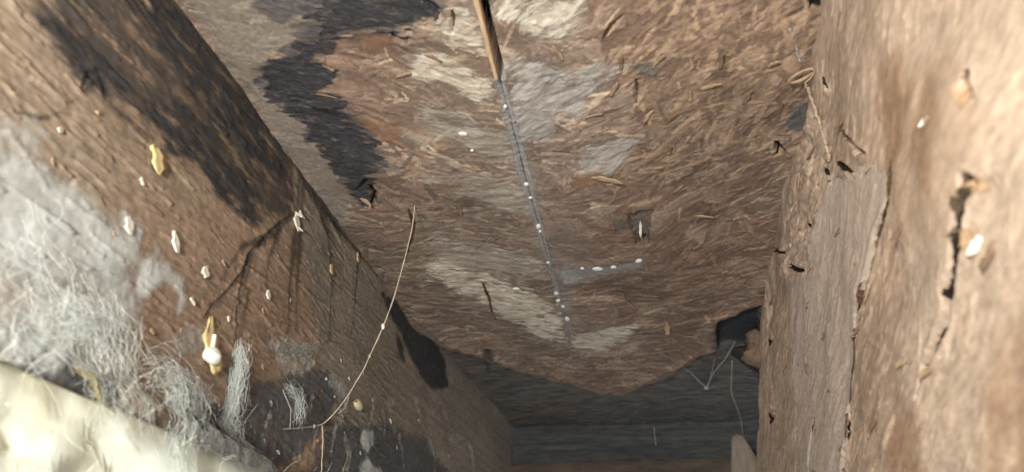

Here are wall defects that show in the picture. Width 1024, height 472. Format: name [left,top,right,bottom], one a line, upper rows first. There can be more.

water stain [33,0,660,472]
crack [941,174,976,301]
water stain [381,292,760,427]
crack [927,327,948,366]